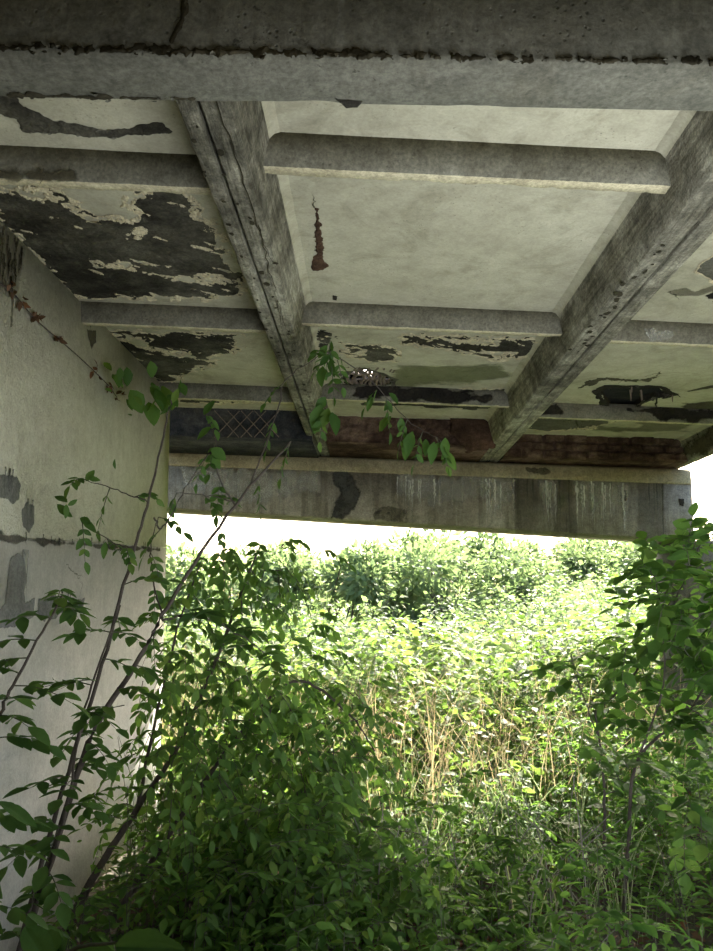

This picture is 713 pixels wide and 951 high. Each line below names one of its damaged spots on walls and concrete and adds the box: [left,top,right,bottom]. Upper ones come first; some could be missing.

spalling [0,91,196,140]
crack [215,101,296,352]
rust [311,196,329,271]
peeling [0,185,310,397]
peeling [693,256,713,284]
peeling [316,330,538,388]
spalling [592,385,680,408]
peeling [528,418,617,432]
water stain [526,467,557,522]
water stain [575,481,626,532]